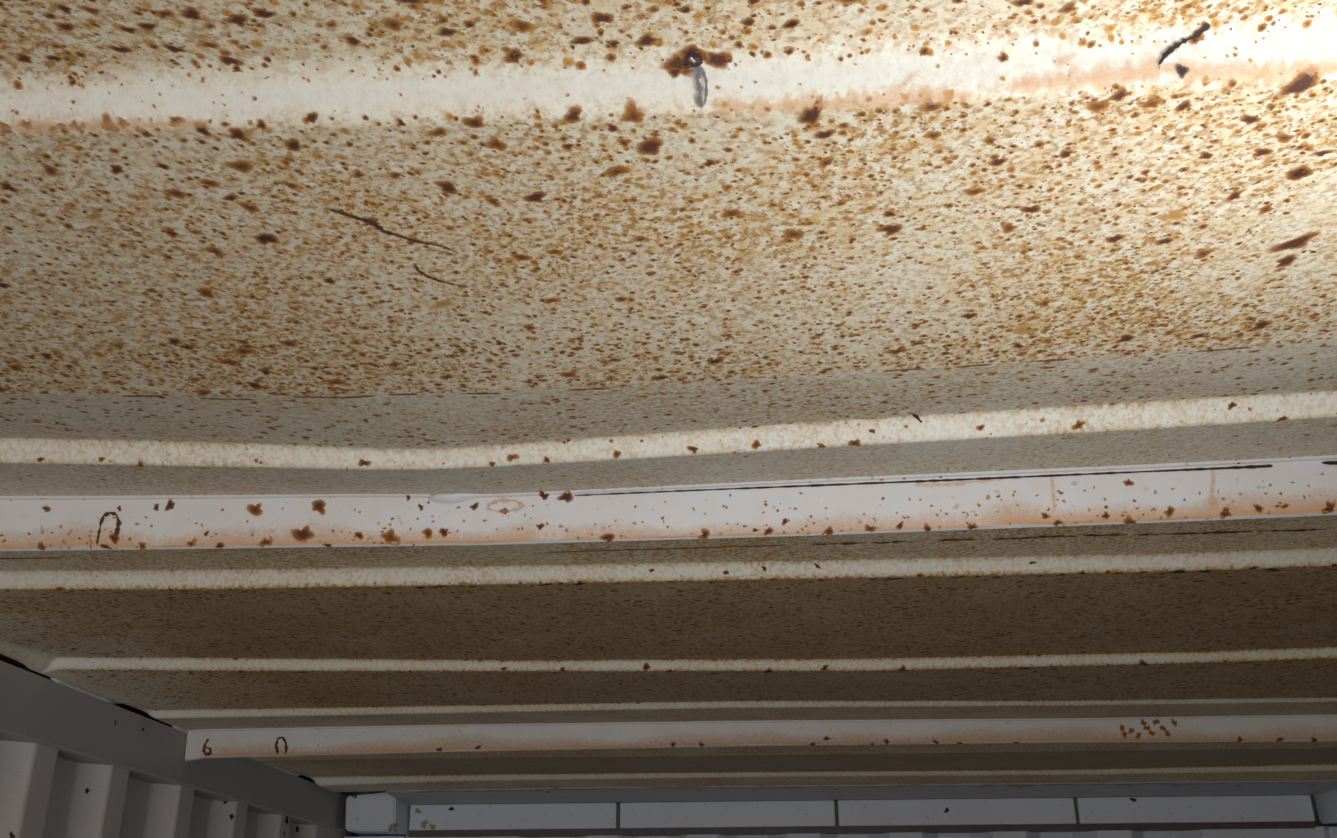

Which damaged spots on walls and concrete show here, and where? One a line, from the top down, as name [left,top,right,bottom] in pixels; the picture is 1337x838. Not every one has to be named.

rust [570,13,614,45]
rust [661,45,733,78]
crack [1158,23,1211,69]
rust [1278,66,1319,97]
rust [462,115,507,151]
rust [608,100,663,155]
rust [794,97,836,139]
rust [1087,87,1192,113]
rust [1253,133,1295,158]
rust [1287,150,1333,181]
crack [329,209,470,288]
rust [1269,232,1318,268]